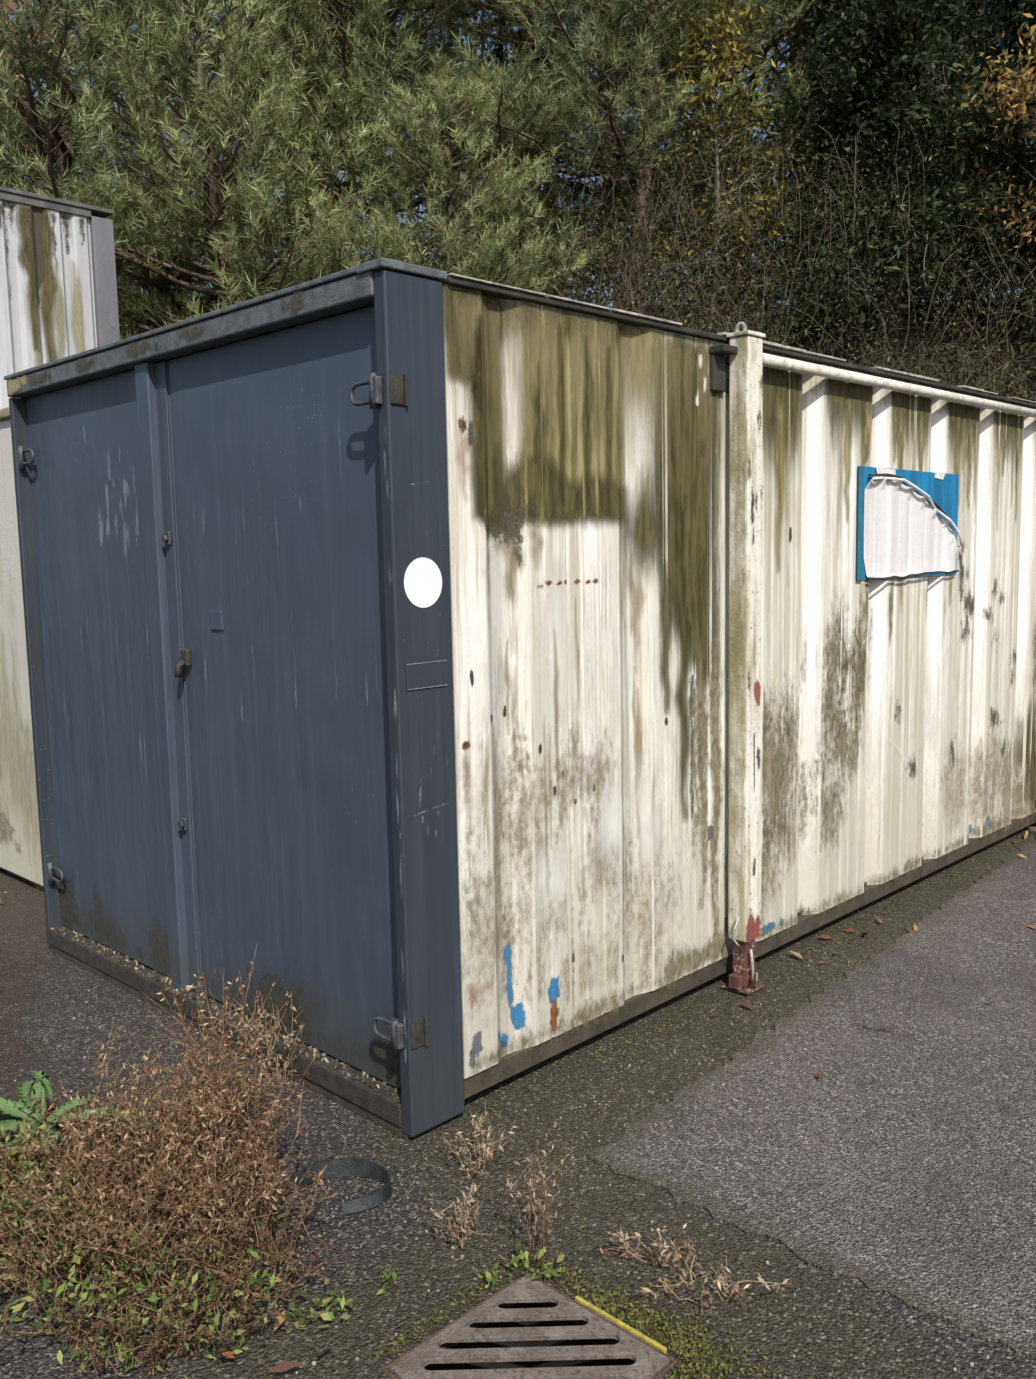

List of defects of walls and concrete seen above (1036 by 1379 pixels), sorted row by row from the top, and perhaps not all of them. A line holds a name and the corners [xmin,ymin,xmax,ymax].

damp [0,203,93,388]
damp [472,319,565,590]
damp [584,347,612,512]
damp [828,366,873,519]
damp [891,378,1024,520]
damp [888,584,902,640]
damp [661,571,721,936]
damp [748,583,872,902]
peeling [469,1031,483,1069]
peeling [499,943,527,1049]
peeling [548,976,561,1032]
rust [746,908,761,943]